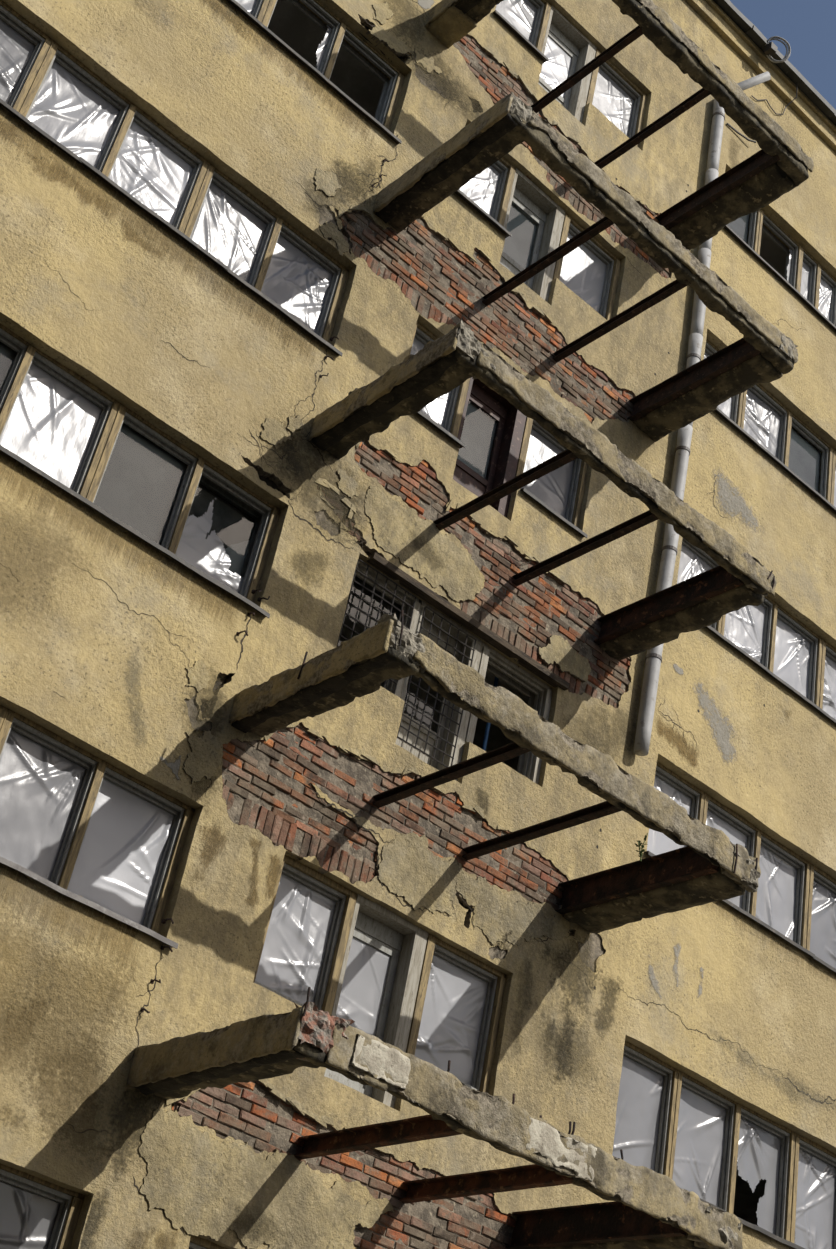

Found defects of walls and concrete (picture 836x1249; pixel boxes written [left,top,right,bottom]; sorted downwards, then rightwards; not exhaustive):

peeling [358,2,450,99]
peeling [418,0,434,9]
flaking render [314,168,636,424]
flaking render [314,440,632,708]
crack [237,617,251,669]
flaking render [222,722,569,910]
spalling [456,892,474,928]
crack [128,943,164,1062]
leakage [556,1002,573,1079]
leakage [596,979,619,1035]
flaking render [166,1078,517,1249]